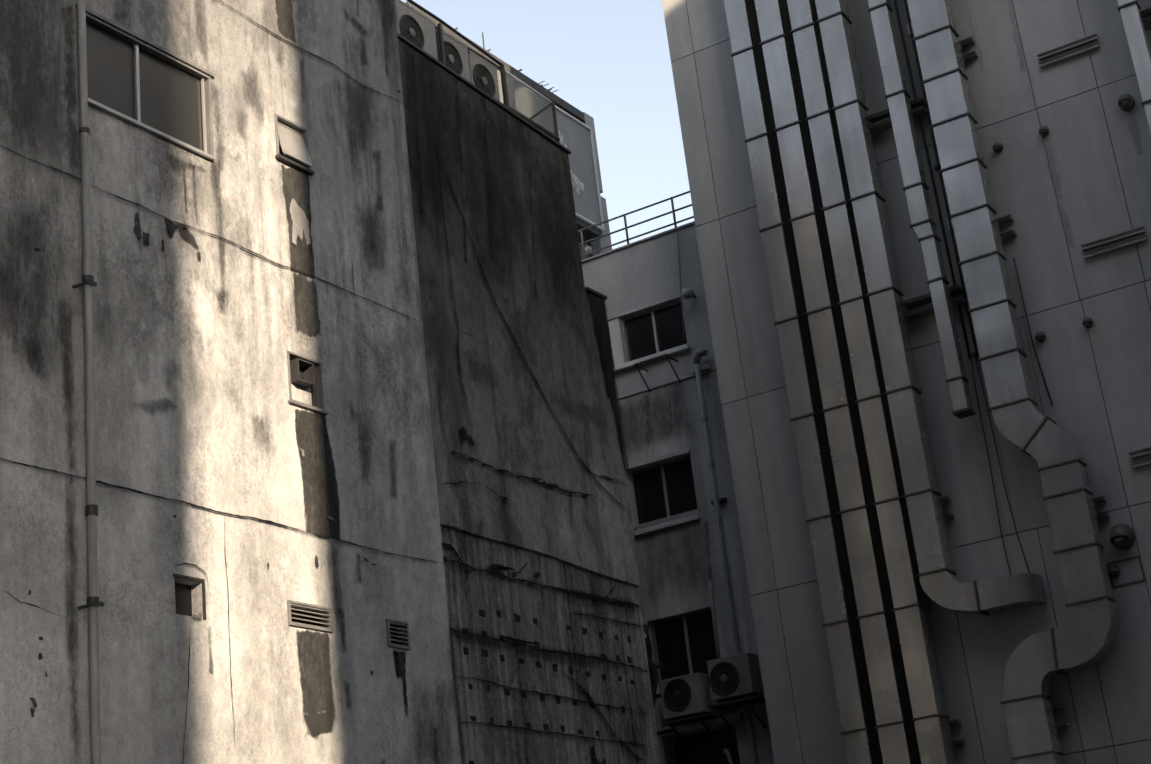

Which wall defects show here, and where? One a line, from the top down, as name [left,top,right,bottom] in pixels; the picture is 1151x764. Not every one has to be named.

water stain [276,0,296,43]
peeling [290,199,311,245]
water stain [0,211,73,447]
crack [431,132,632,512]
water stain [67,500,78,663]
crack [182,621,191,764]
crack [174,554,235,742]
crack [0,458,645,627]
water stain [295,409,351,737]
crack [449,624,651,764]